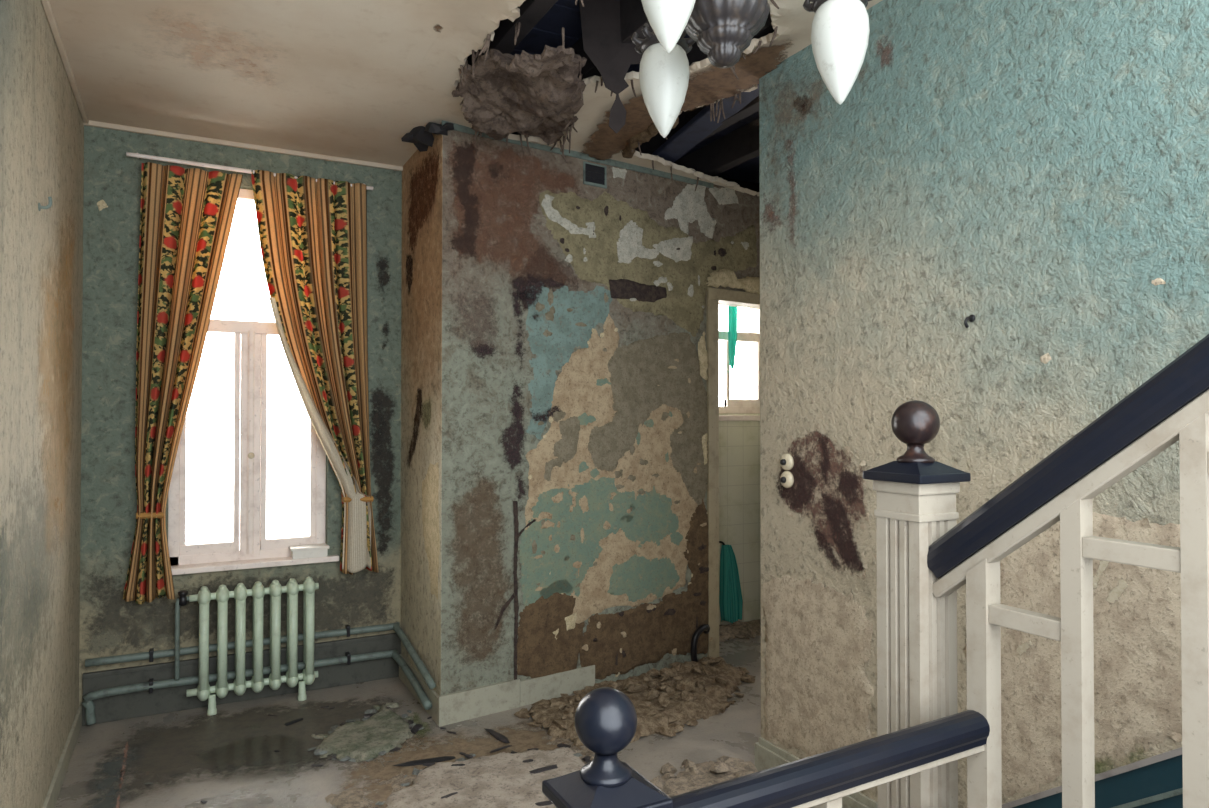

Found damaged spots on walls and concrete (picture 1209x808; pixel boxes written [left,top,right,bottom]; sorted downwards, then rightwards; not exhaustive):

peeling [612,117,679,179]
damp [448,141,577,364]
damp [501,382,561,511]
peeling [525,184,760,640]
damp [449,477,509,663]